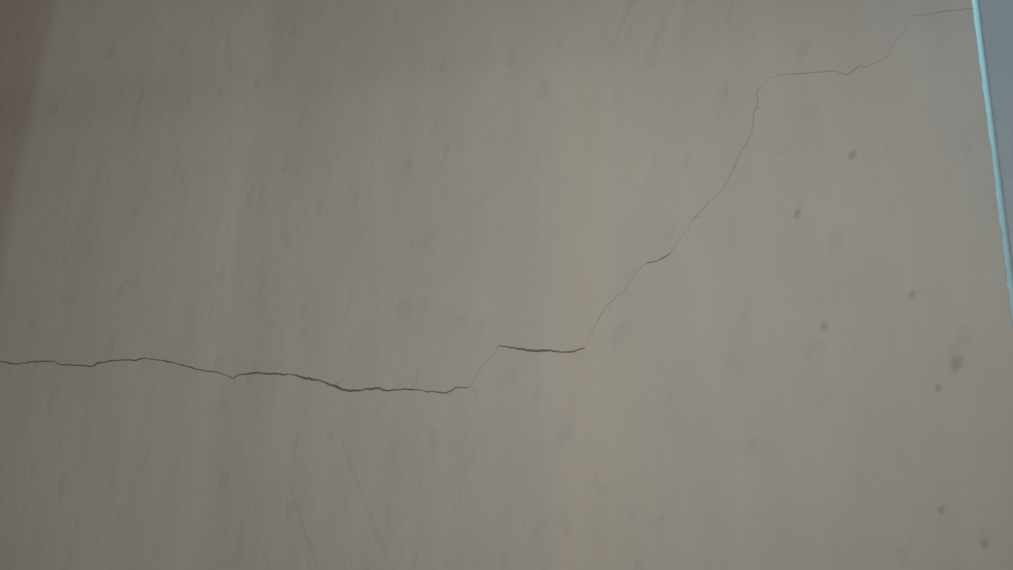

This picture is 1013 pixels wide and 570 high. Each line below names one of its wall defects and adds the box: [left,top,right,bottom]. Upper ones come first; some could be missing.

crack [0,8,973,396]